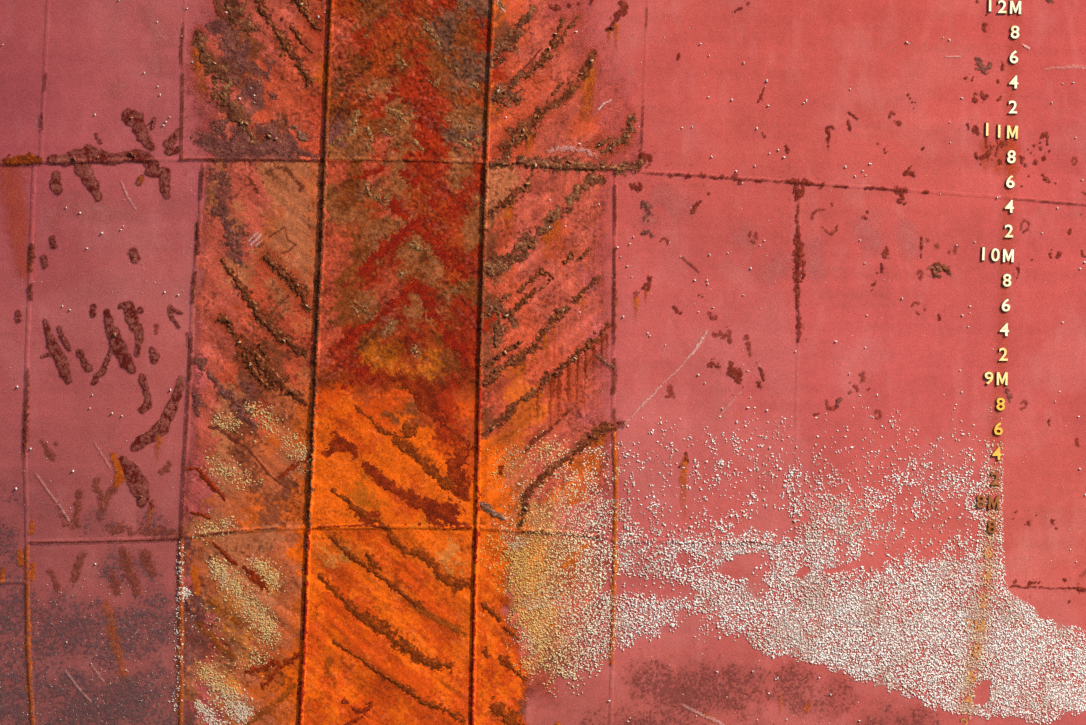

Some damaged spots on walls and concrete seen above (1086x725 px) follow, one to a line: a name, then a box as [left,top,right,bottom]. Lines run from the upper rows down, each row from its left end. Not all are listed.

corrosion [964,56,1005,103]
corrosion [865,165,916,205]
corrosion [967,123,1086,205]
corrosion [17,0,848,725]